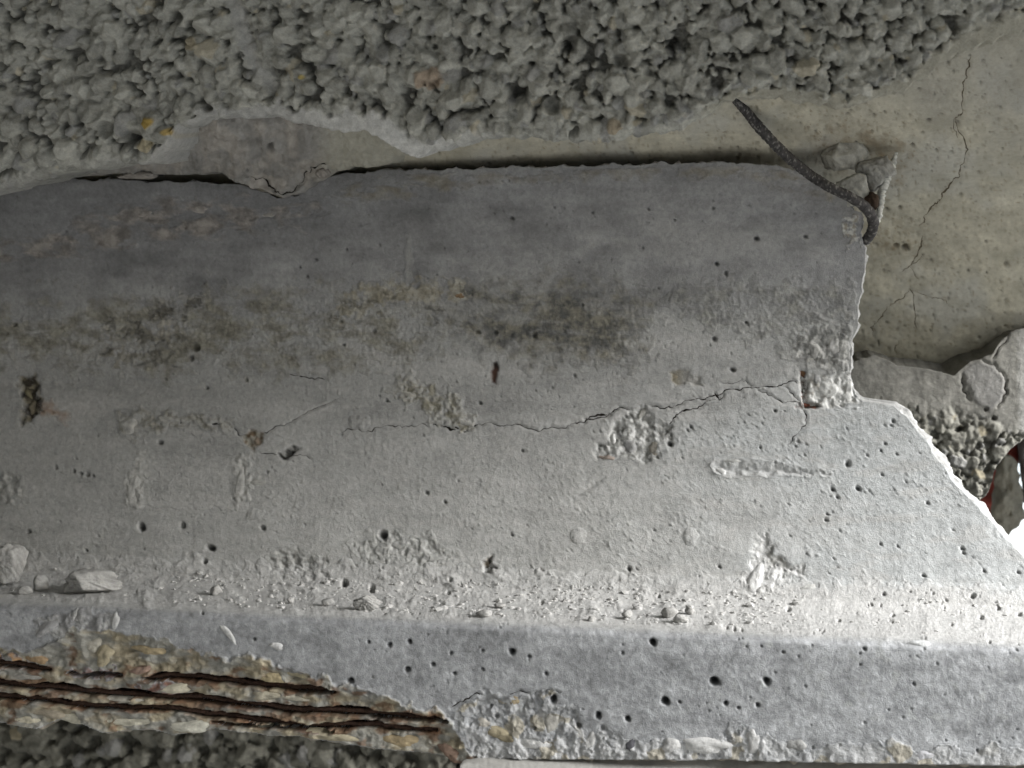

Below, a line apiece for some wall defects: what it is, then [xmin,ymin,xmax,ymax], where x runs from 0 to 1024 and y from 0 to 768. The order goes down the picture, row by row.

corrosion [864,191,879,210]
spalling [876,152,898,223]
crack [870,57,971,355]
crack [345,407,628,433]
crack [656,380,807,444]
corrosion [0,651,38,671]
corrosion [69,664,120,682]
corrosion [134,678,183,695]
spalling [0,606,1024,766]